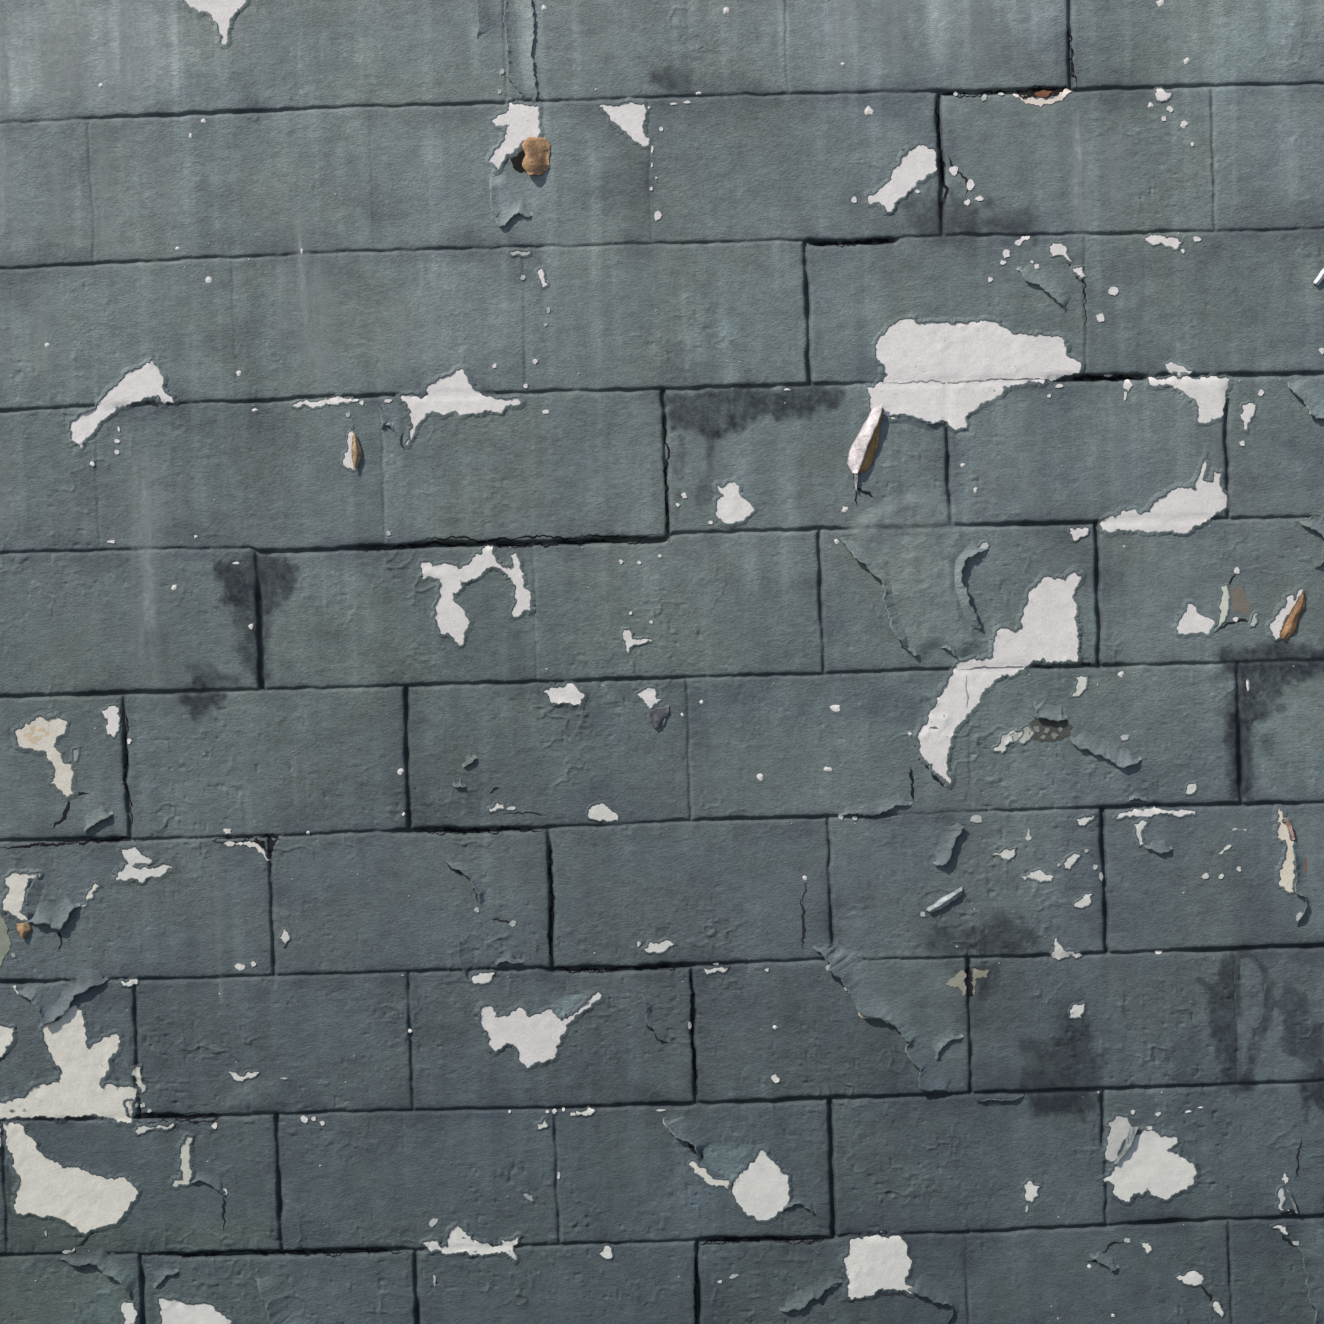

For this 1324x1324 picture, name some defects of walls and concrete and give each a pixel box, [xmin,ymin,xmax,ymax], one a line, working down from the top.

peeling [65,356,179,466]
water stain [670,384,837,437]
peeling [847,314,1086,505]
peeling [1104,359,1264,446]
peeling [1066,449,1233,543]
peeling [416,542,536,649]
peeling [838,565,1142,820]
peeling [458,939,608,1072]
peeling [0,969,236,1324]
peeling [1096,1110,1202,1206]
peeling [419,1218,524,1266]
peeling [779,1227,960,1324]